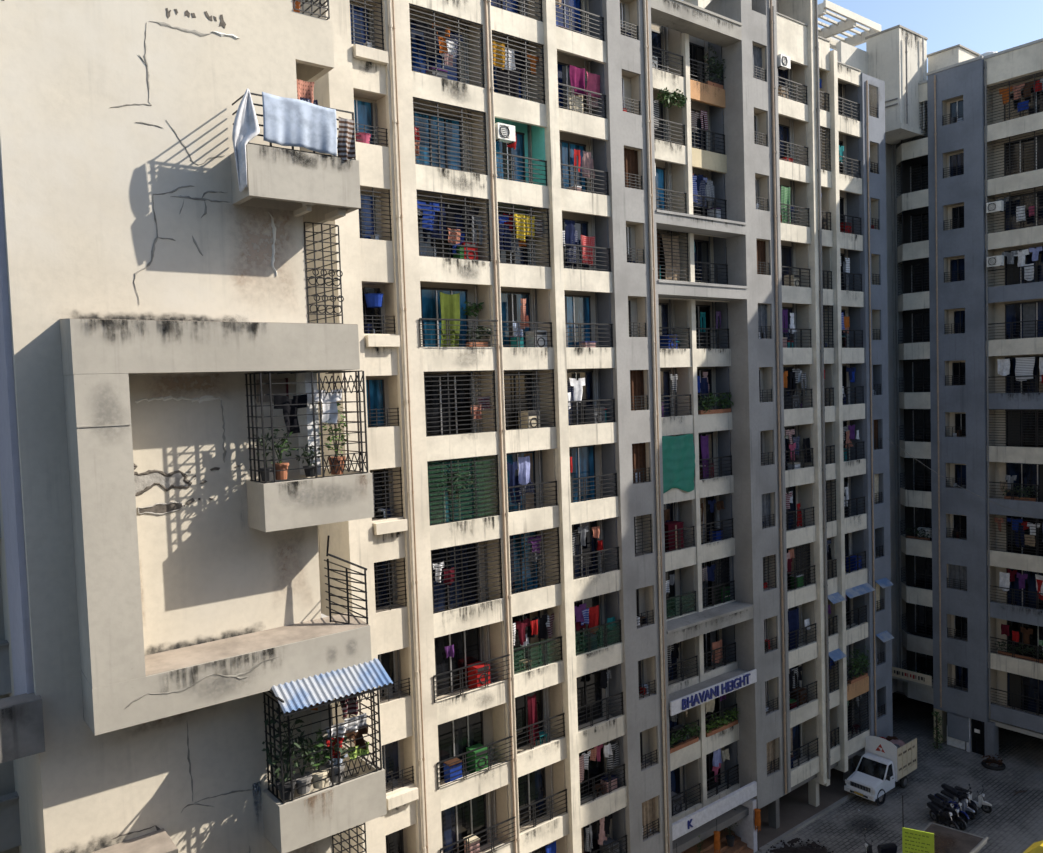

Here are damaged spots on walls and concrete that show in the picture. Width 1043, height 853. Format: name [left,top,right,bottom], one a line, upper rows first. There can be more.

crack [110,21,227,299]
damp [78,315,236,337]
spalling [134,464,220,515]
crack [182,723,255,811]
damp [60,838,121,853]